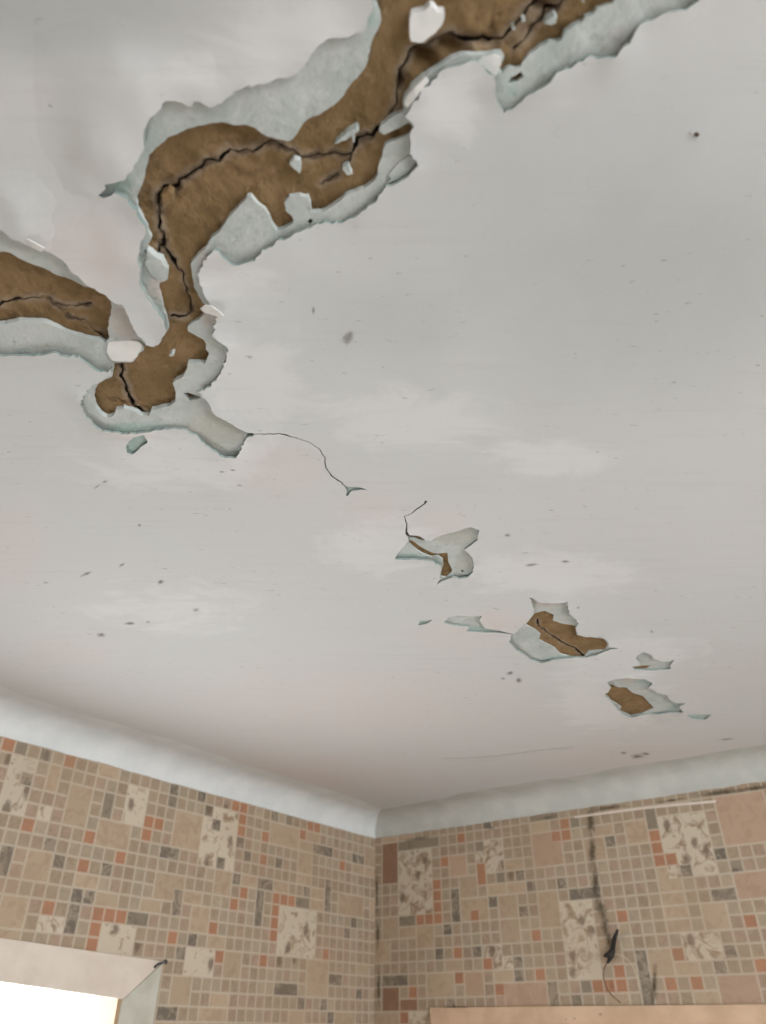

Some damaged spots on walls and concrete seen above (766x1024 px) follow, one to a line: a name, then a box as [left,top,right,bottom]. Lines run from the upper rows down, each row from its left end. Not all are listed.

spalling [0,0,696,456]
spalling [396,518,479,581]
spalling [445,598,611,662]
spalling [605,652,709,718]